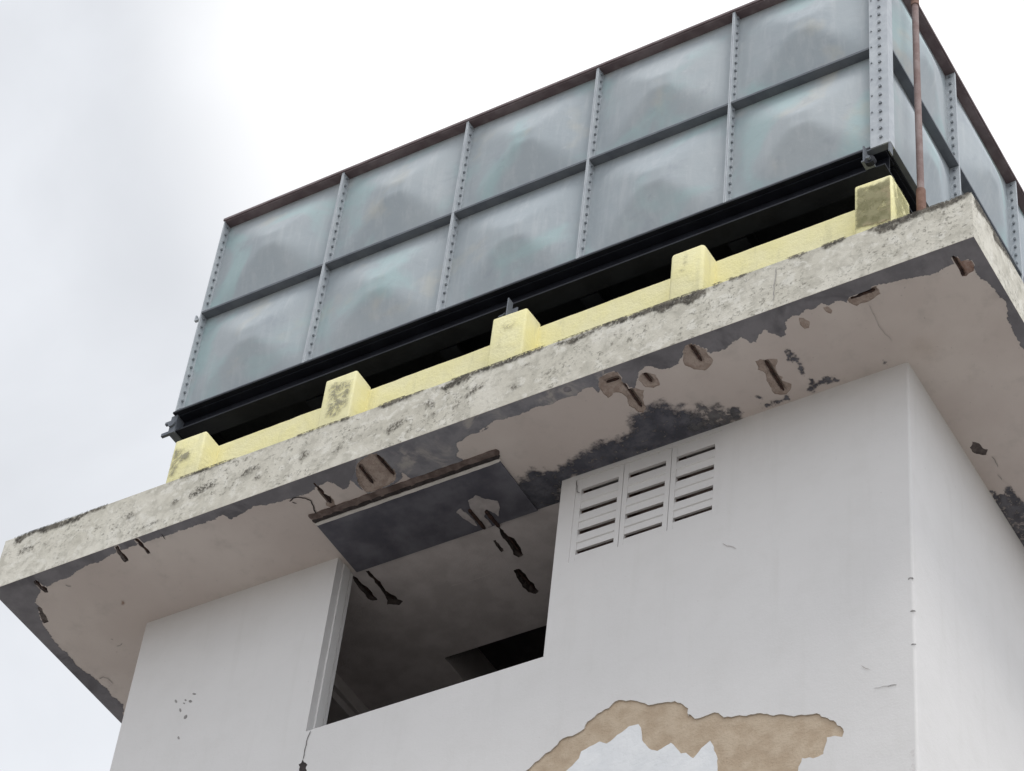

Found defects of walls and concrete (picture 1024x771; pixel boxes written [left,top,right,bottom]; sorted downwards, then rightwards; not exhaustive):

corrosion [308,449,500,520]
peeling [0,237,1024,724]
water stain [519,403,741,509]
water stain [990,487,1024,546]
flaking render [526,700,844,771]